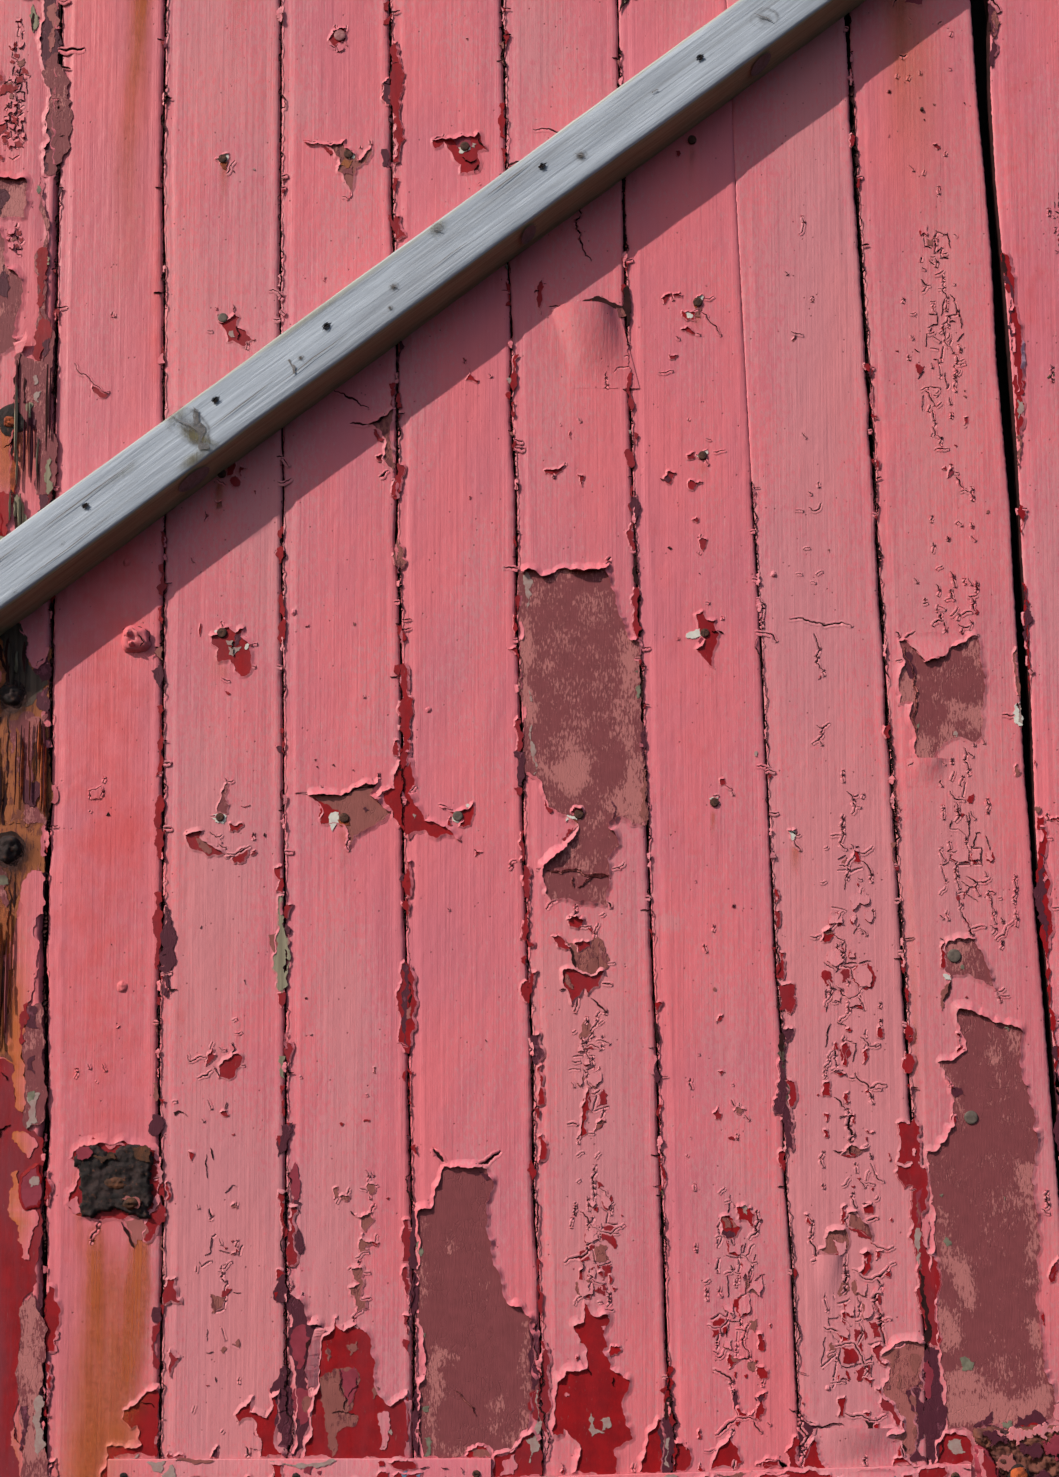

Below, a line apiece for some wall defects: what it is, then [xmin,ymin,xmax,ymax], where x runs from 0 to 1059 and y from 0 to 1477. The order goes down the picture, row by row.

crack [900,186,966,447]
corrosion [0,403,27,492]
peeling [280,662,483,857]
peeling [508,562,648,1015]
crack [811,721,876,1068]
crack [894,510,989,663]
peeling [881,583,1035,758]
crack [907,738,1020,950]
peeling [0,620,172,1477]
peeling [181,806,1059,1477]
crack [532,1135,892,1389]
peeling [96,1347,186,1477]